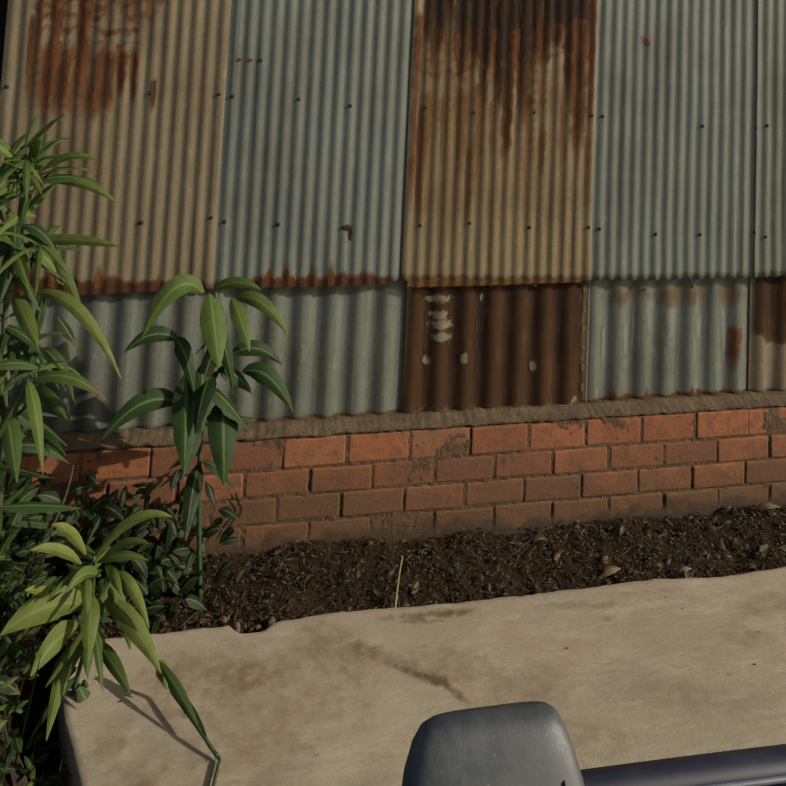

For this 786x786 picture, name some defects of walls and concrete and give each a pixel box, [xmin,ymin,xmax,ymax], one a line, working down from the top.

rust [27,0,163,116]
rust [410,0,597,215]
rust [30,269,166,295]
rust [250,264,390,288]
peeling [425,294,453,342]
rust [403,276,584,413]
rust [727,327,742,364]
rust [754,276,786,344]